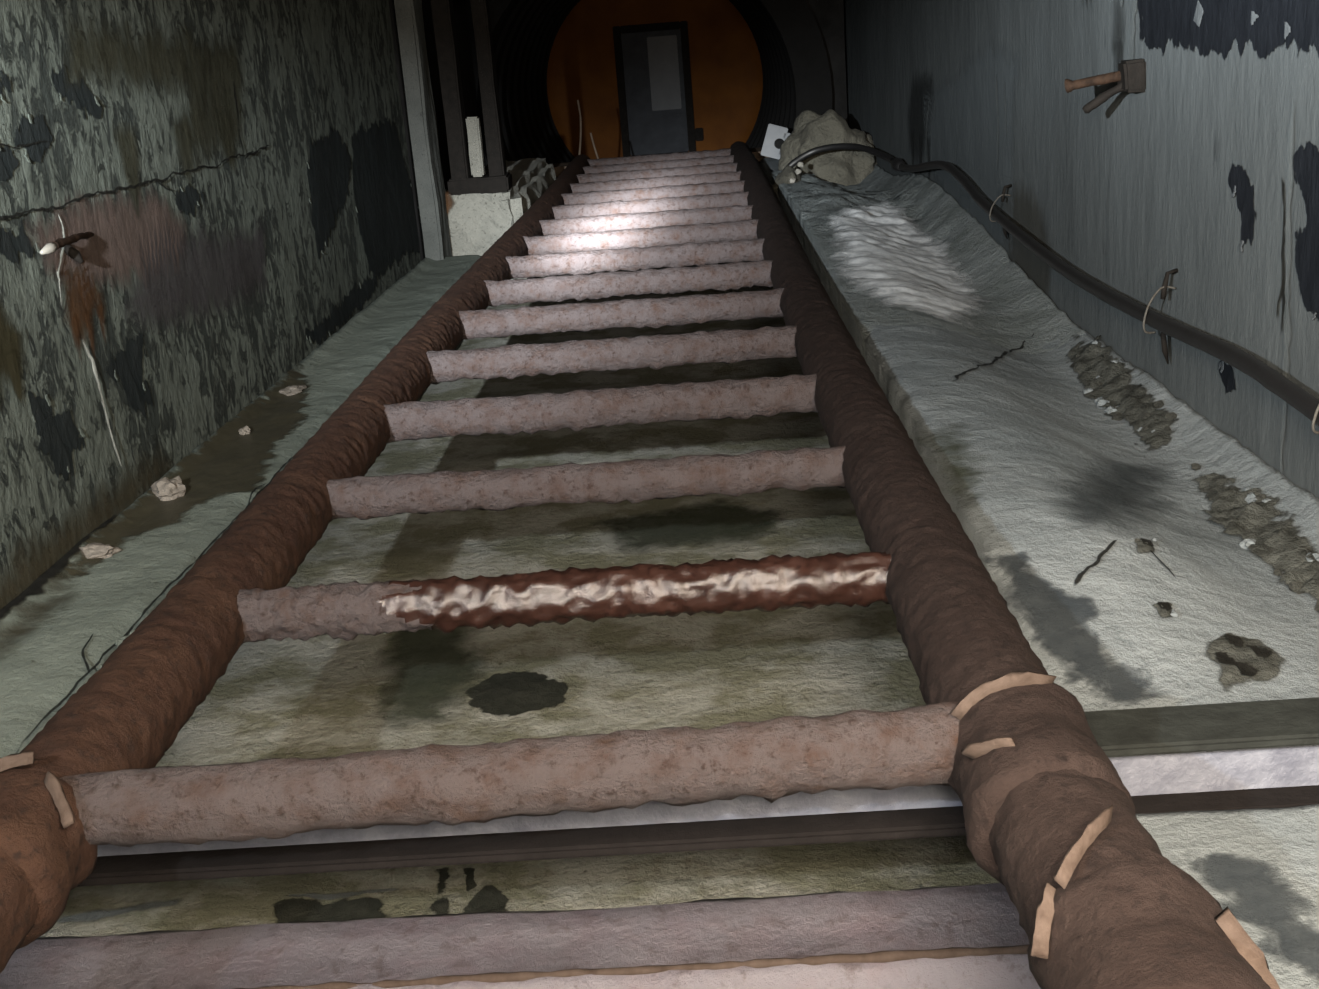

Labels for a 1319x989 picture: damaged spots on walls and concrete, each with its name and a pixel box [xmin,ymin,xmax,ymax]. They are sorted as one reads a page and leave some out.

peeling [1137,0,1319,60]
crack [0,82,269,220]
peeling [1228,164,1257,252]
peeling [1292,141,1319,320]
spalling [1066,335,1179,450]
spalling [1190,463,1319,613]
spalling [1205,633,1285,691]